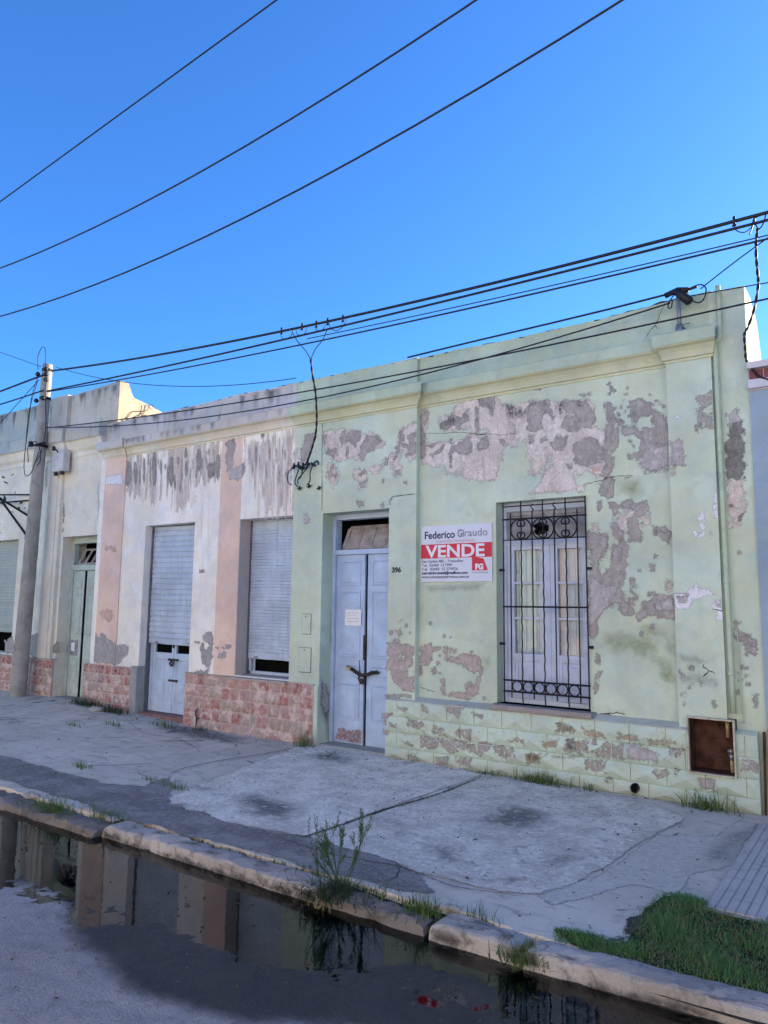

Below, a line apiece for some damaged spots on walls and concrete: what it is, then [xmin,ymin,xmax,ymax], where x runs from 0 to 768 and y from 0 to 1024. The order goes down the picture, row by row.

peeling [105,382,759,707]
peeling [94,633,129,666]
peeling [336,728,364,743]
peeling [382,618,684,784]
crack [281,777,519,896]